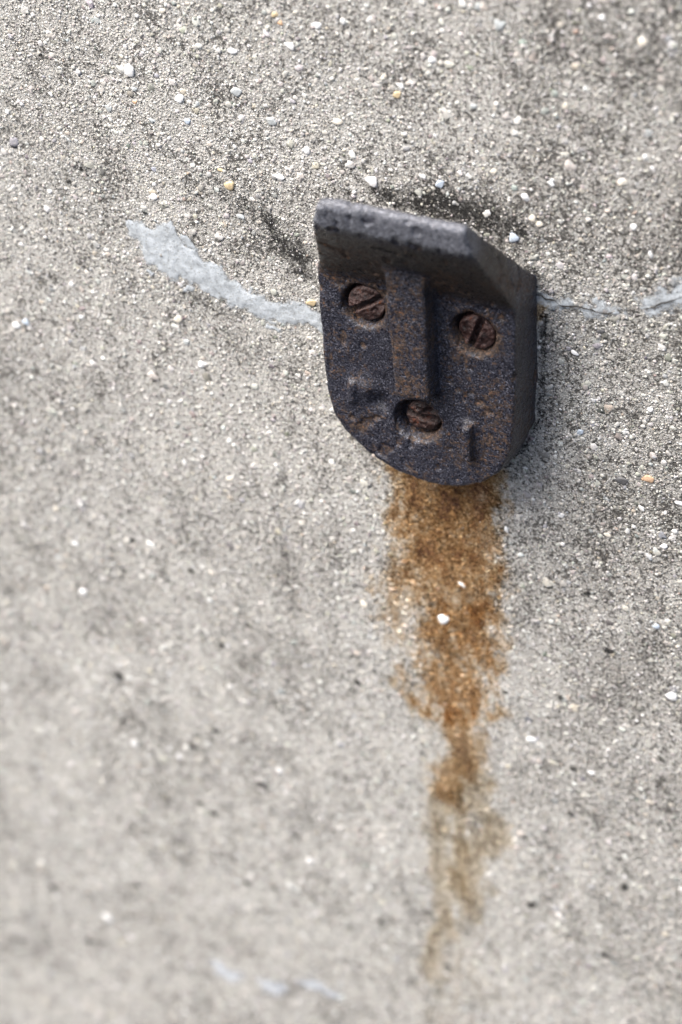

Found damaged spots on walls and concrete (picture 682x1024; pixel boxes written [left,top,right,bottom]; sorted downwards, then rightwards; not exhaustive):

crack [536,295,682,315]
rust [416,476,502,642]